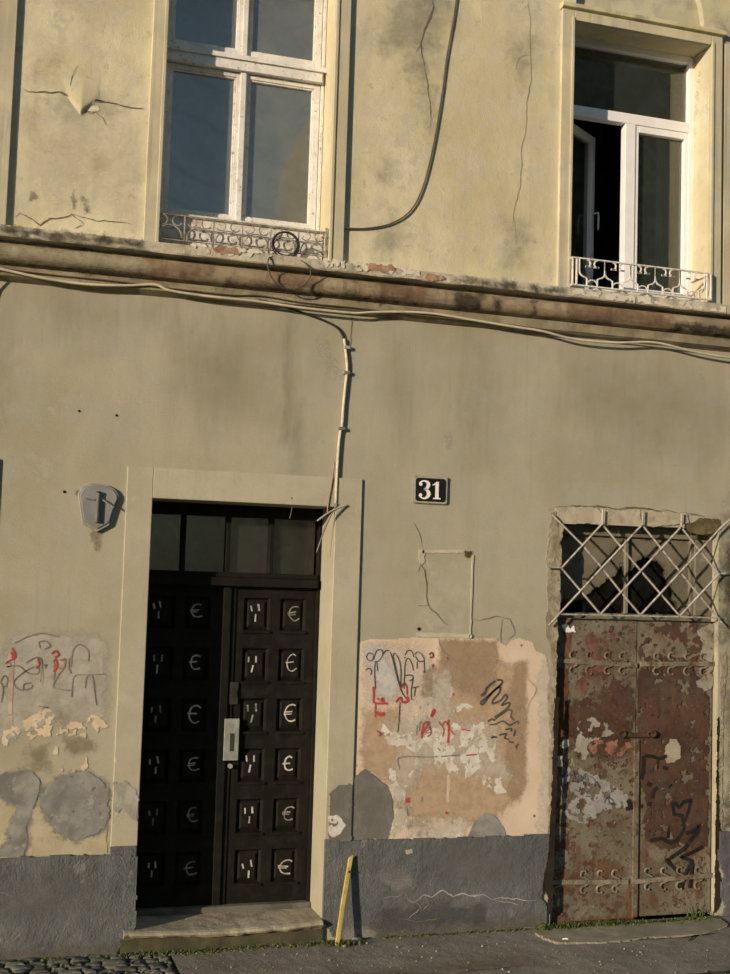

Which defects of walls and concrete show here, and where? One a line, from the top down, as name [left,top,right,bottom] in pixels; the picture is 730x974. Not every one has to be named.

crack [26,65,143,127]
crack [415,0,437,125]
crack [513,1,532,247]
crack [17,213,130,228]
peeling [323,258,445,281]
crack [415,525,456,672]
peeling [0,797,16,847]
peeling [2,708,109,755]
peeling [27,806,108,856]
peeling [381,685,507,839]
corrosion [555,622,710,850]
flaking render [545,507,730,836]